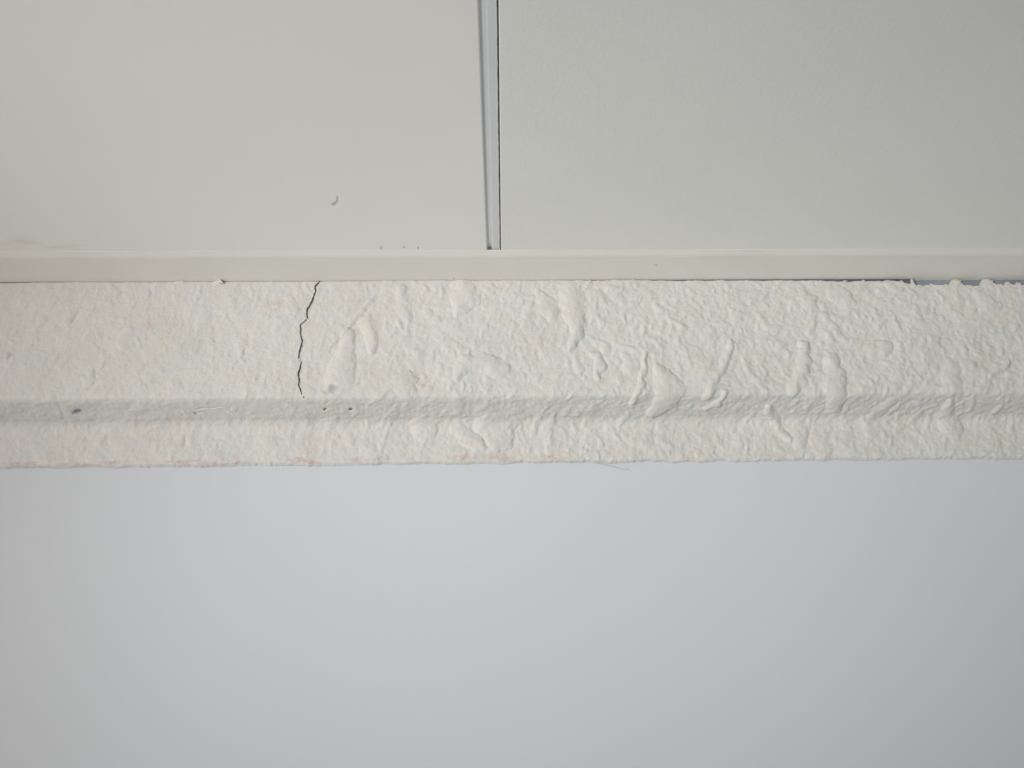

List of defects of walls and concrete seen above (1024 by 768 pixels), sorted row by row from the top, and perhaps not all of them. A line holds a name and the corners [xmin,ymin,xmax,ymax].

crack [298,281,320,398]